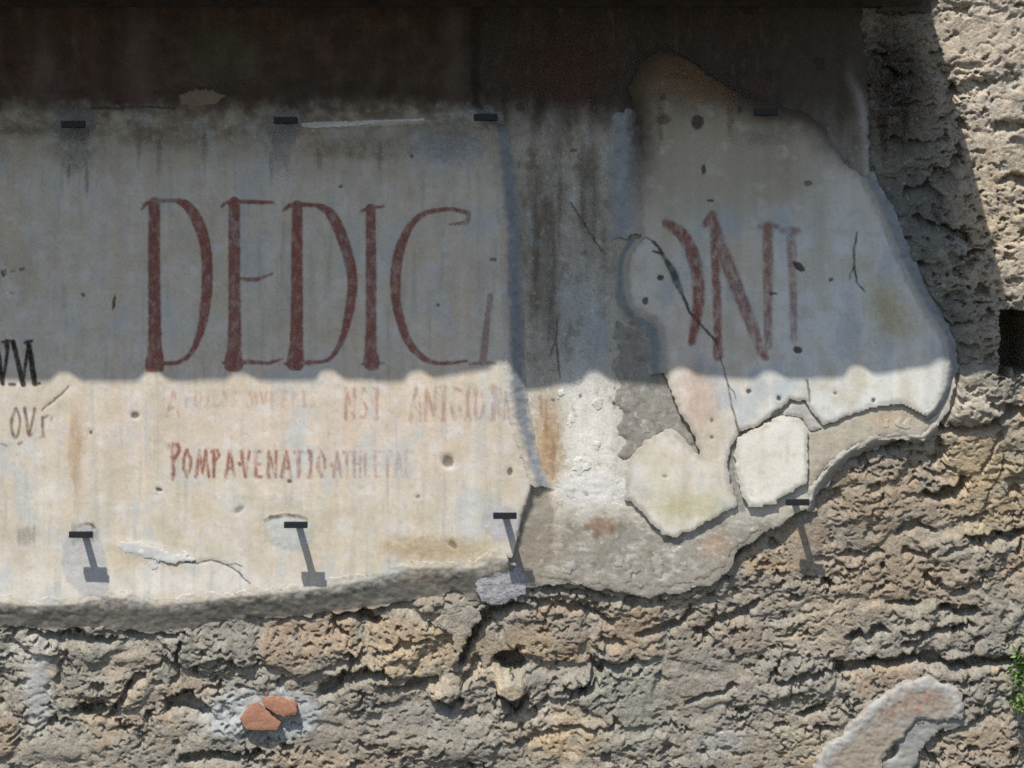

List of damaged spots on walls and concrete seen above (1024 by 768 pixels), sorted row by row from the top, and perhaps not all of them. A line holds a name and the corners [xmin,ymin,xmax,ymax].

crack [650,239,716,341]
flaking render [485,110,761,593]
crack [186,559,247,581]